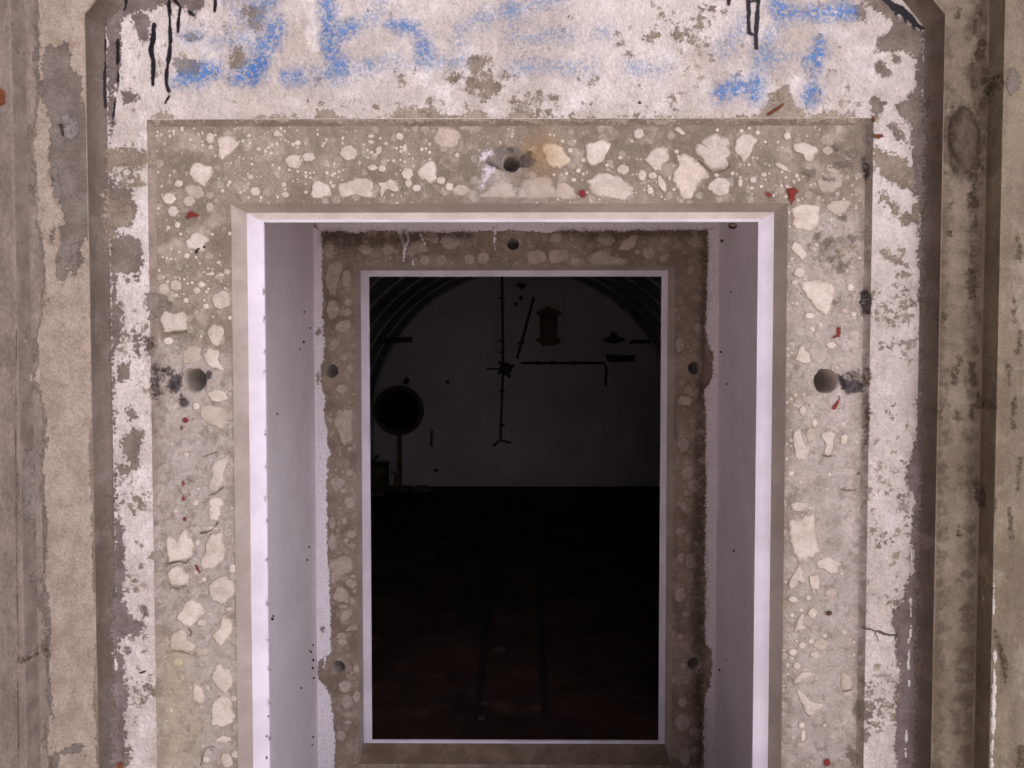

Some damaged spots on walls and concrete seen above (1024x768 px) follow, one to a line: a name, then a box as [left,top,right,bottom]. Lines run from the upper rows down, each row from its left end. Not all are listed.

spalling [97,0,238,768]
spalling [151,0,929,768]
crack [862,626,898,641]
damp [937,292,997,485]